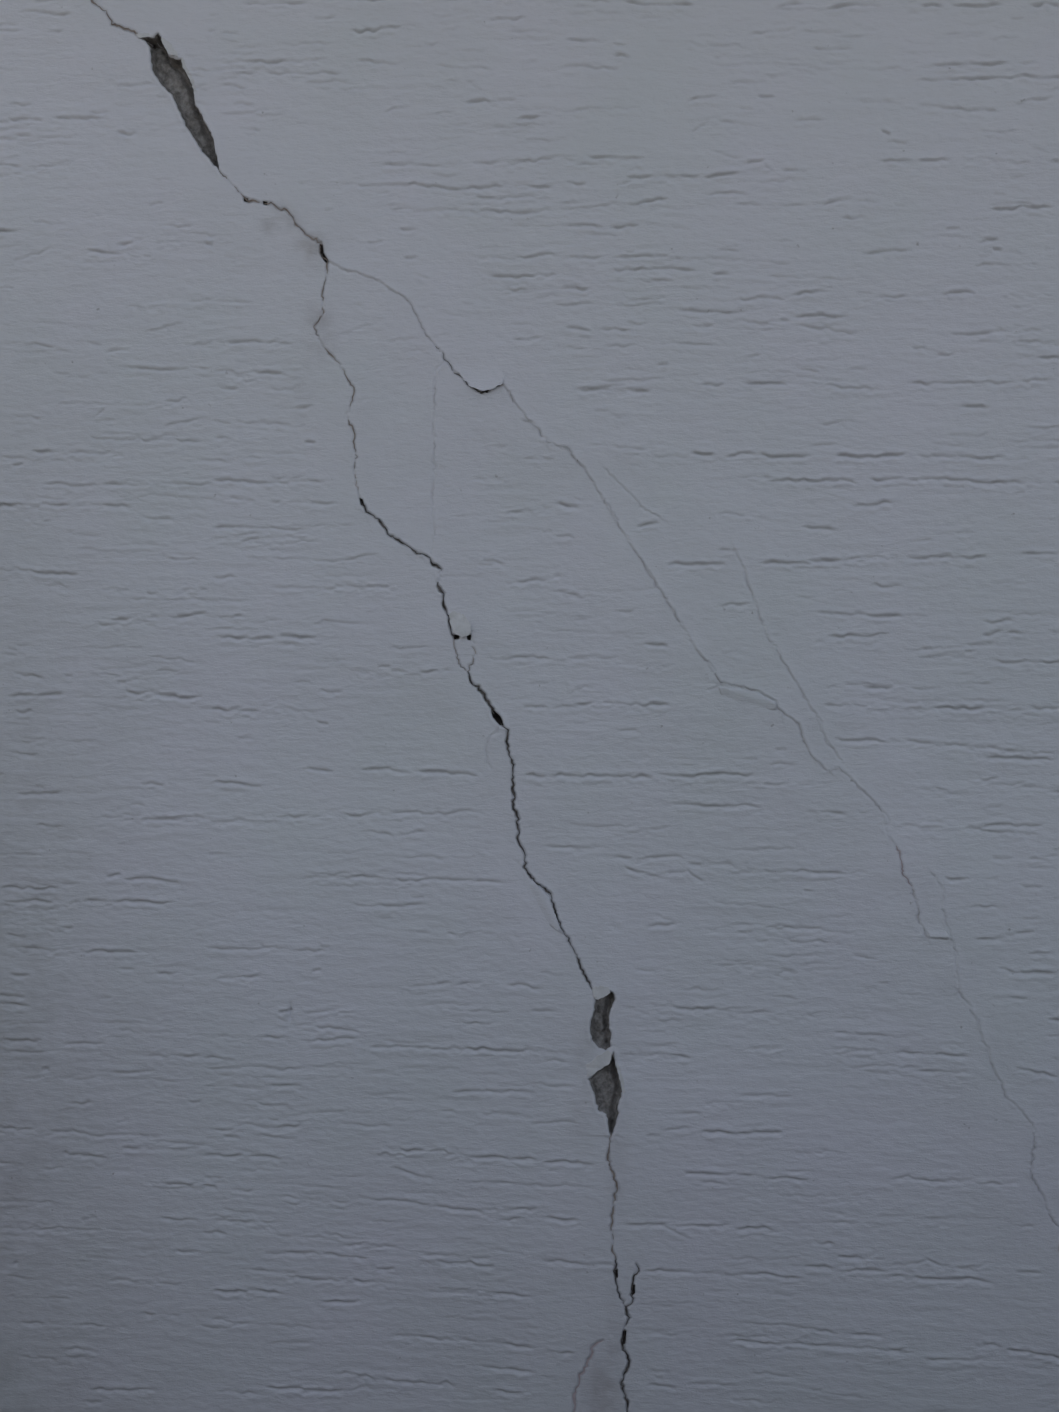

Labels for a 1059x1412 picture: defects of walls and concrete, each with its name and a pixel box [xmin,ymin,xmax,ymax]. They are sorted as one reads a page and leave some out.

crack [91,0,138,34]
flaking render [136,33,219,170]
crack [219,171,680,988]
crack [699,576,1057,1226]
flaking render [586,985,626,1135]
crack [572,1135,639,1412]